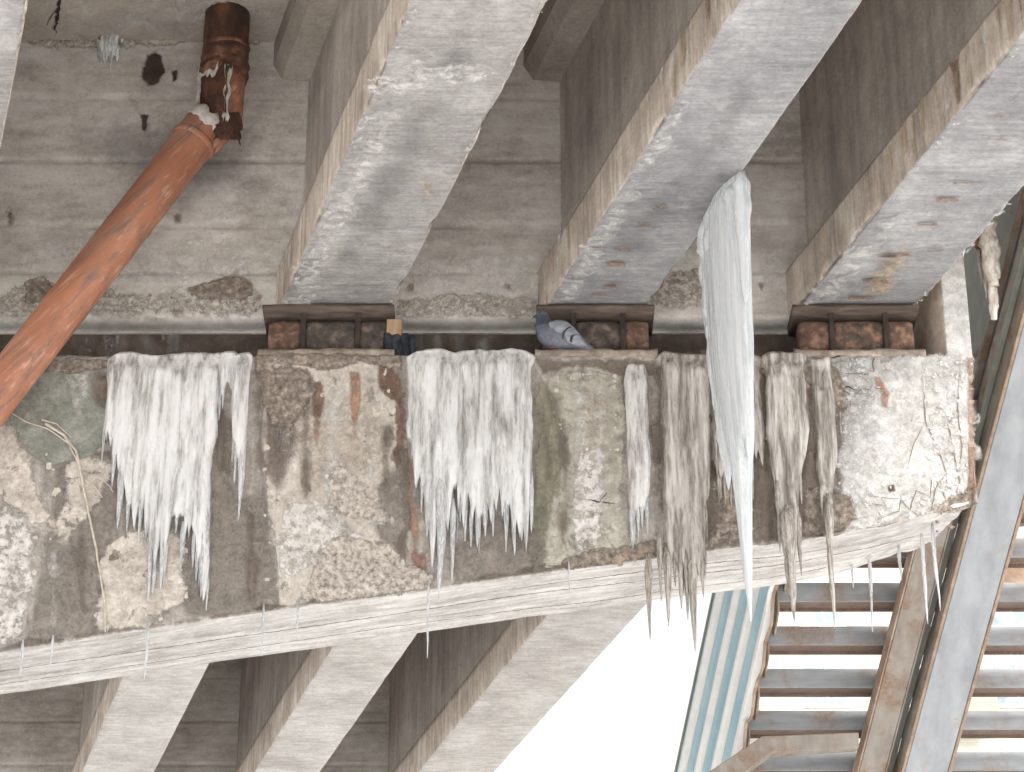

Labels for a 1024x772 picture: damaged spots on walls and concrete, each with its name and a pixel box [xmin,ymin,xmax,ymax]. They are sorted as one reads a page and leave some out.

corrosion [199,61,243,146]
spalling [0,276,52,321]
spalling [90,276,261,321]
spalling [391,293,536,320]
spalling [651,268,702,308]
corrosion [312,382,324,441]
corrosion [350,373,360,420]
crack [812,355,883,415]
crack [852,368,963,520]